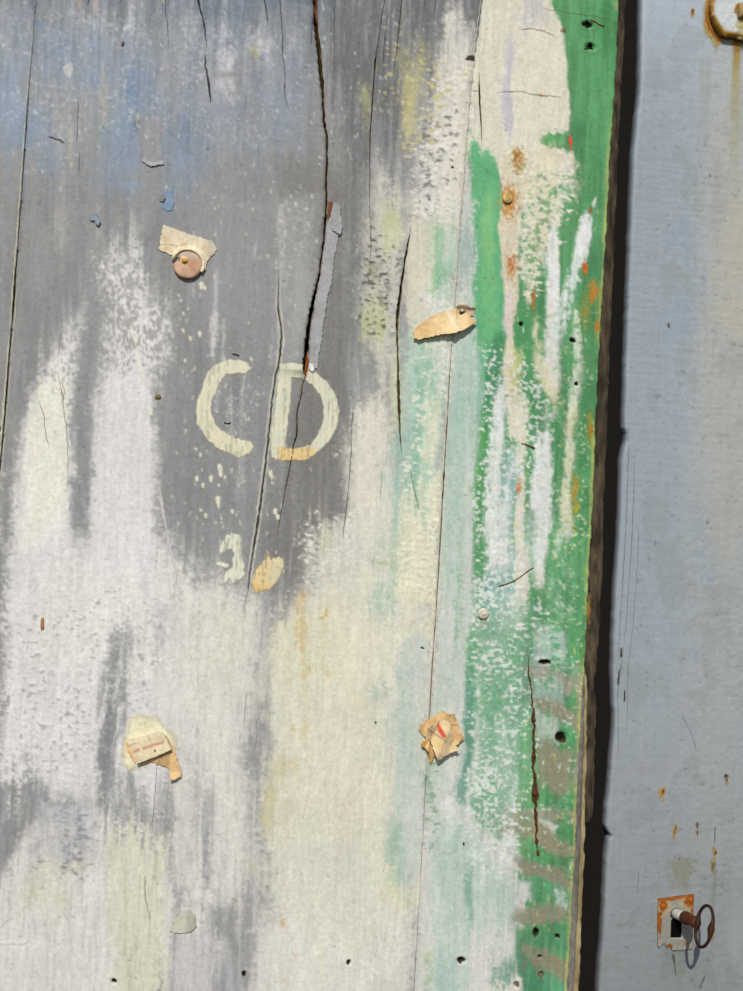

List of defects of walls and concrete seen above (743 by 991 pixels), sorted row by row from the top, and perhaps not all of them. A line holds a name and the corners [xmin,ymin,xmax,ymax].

crack [197,0,211,102]
rust [691,0,743,66]
rust [501,146,526,219]
crack [243,0,328,606]
crack [396,235,410,451]
crack [527,654,540,856]